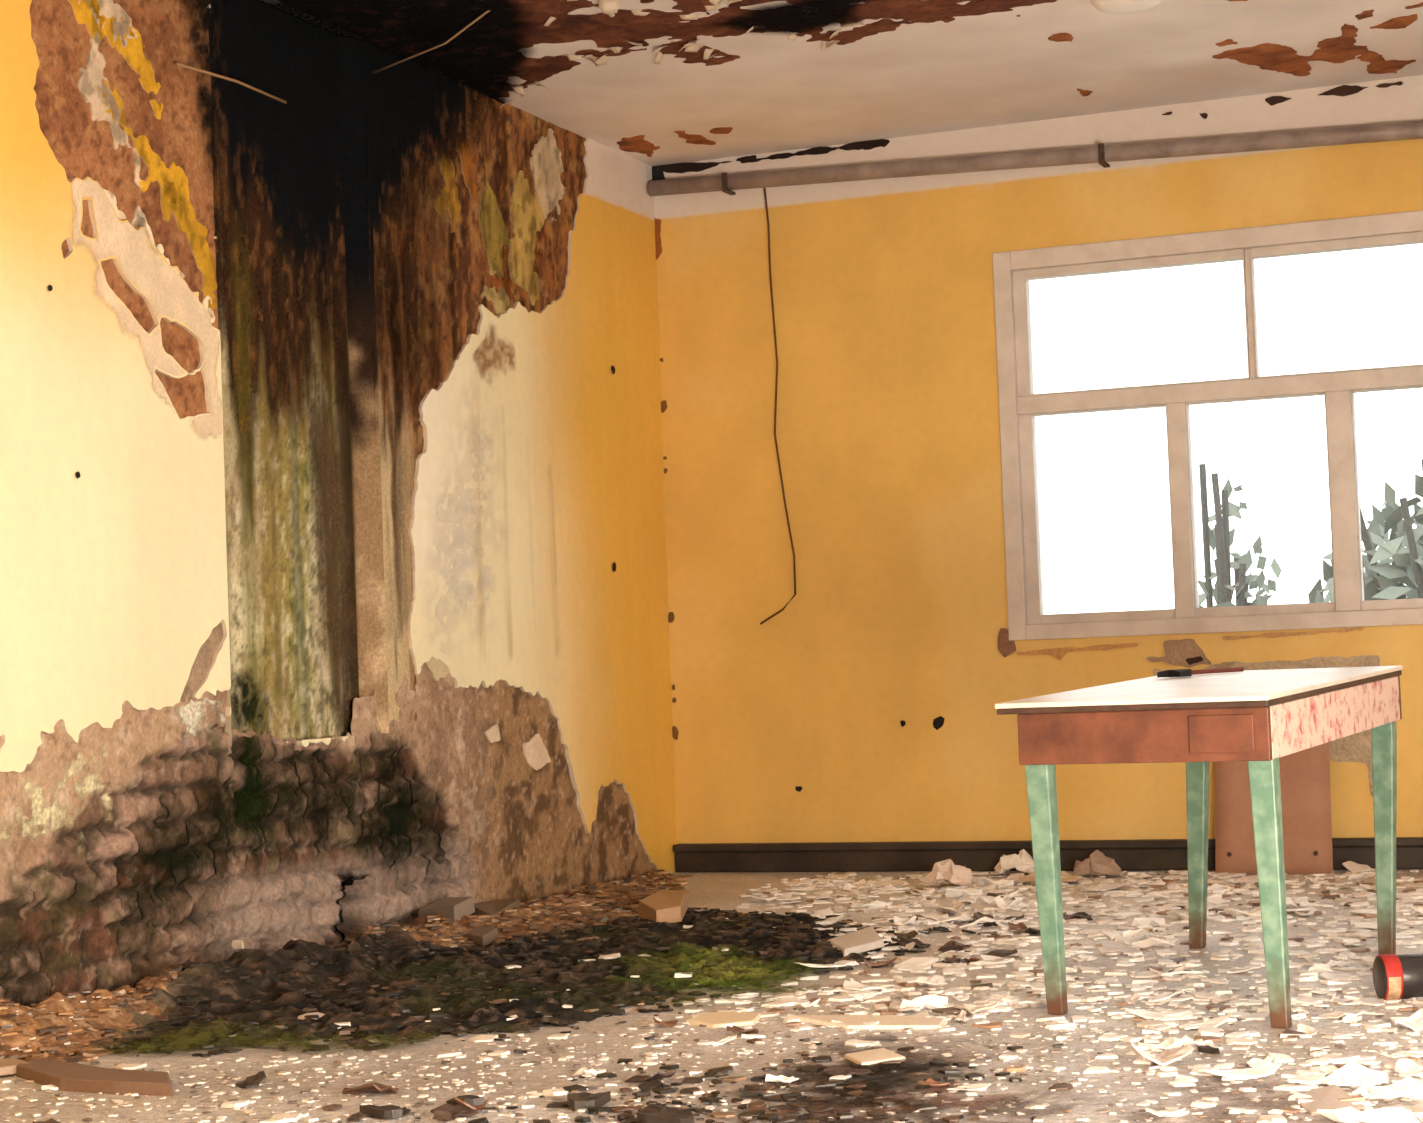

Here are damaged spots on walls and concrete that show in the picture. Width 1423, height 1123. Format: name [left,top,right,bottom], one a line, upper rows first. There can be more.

peeling [788,0,1057,51]
peeling [1048,33,1073,42]
peeling [1212,2,1423,76]
leakage [191,0,495,736]
leakage [475,328,513,374]
flaking render [0,0,811,1008]
leakage [179,698,225,735]
leakage [0,753,111,839]
leakage [70,736,441,939]
leakage [0,917,63,1003]